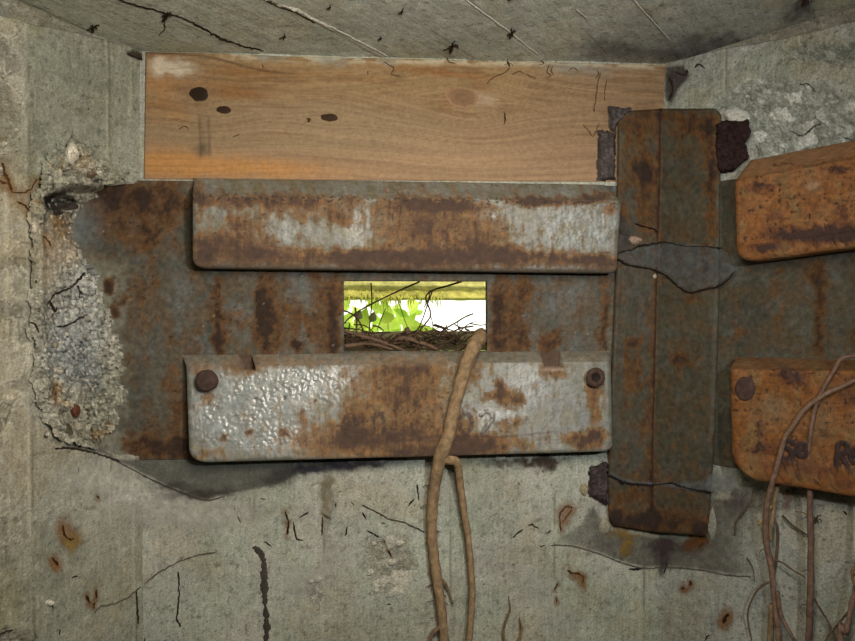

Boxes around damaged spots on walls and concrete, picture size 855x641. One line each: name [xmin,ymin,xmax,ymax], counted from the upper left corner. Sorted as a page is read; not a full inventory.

crack [119,0,263,51]
crack [266,1,315,23]
spalling [24,135,130,450]
crack [94,552,216,627]
spalling [0,627,40,641]